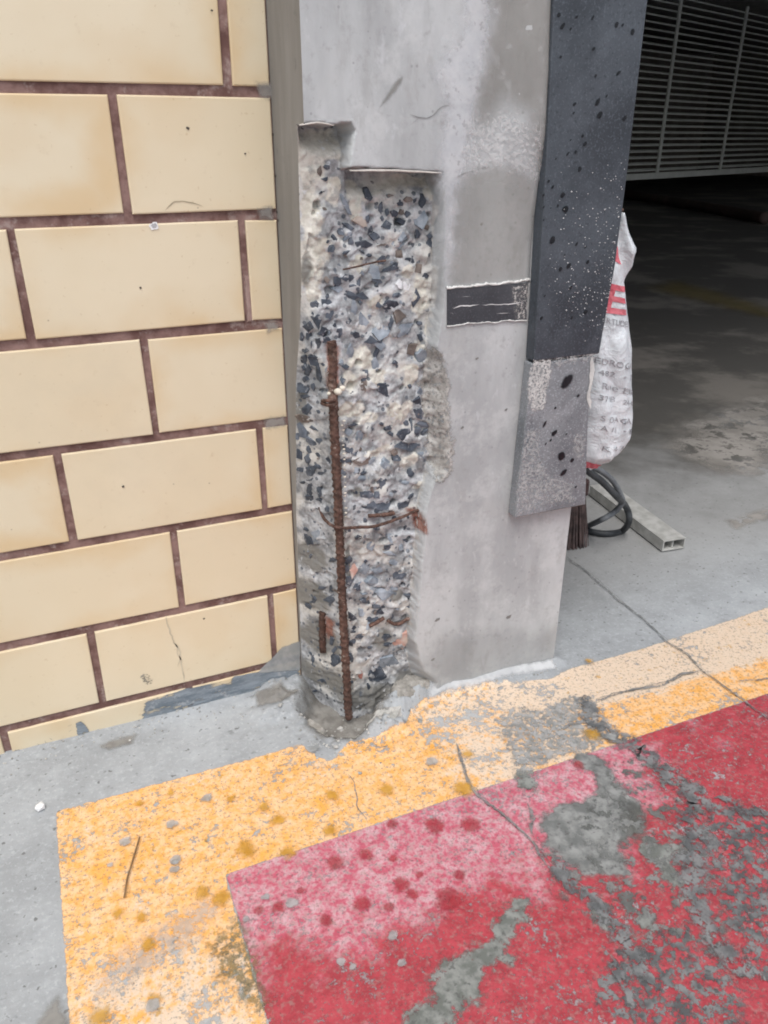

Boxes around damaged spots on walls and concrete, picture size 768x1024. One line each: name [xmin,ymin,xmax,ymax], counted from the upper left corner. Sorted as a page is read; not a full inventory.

crack [165,615,185,680]
rust [318,340,353,721]
spalling [295,118,464,728]
rust [408,508,427,534]
peeling [402,898,530,1024]
peeling [494,694,768,1024]
crack [557,556,768,981]